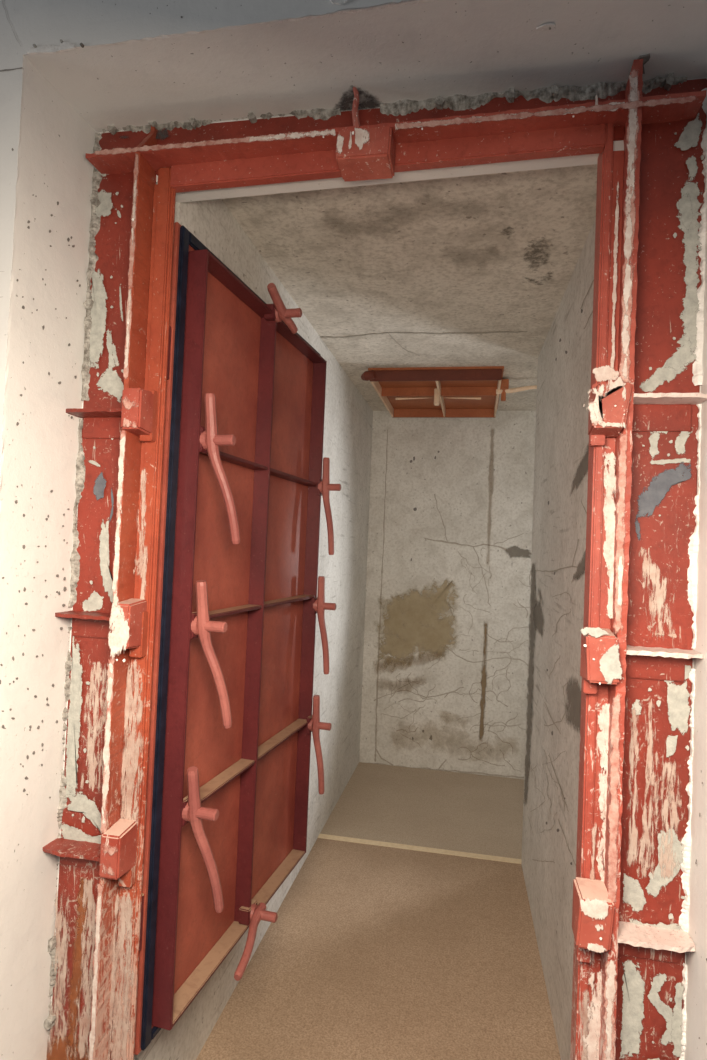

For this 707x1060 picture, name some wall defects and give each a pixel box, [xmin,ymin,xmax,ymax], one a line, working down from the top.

damp [572,444,589,514]
damp [573,550,586,579]
peeling [602,452,616,619]
peeling [56,430,130,844]
damp [378,580,458,666]
crack [372,430,579,833]
damp [506,546,581,803]
peeling [581,627,622,685]
peeling [631,665,692,757]
peeling [590,703,610,881]
peeling [623,825,697,930]
peeling [619,961,684,1060]